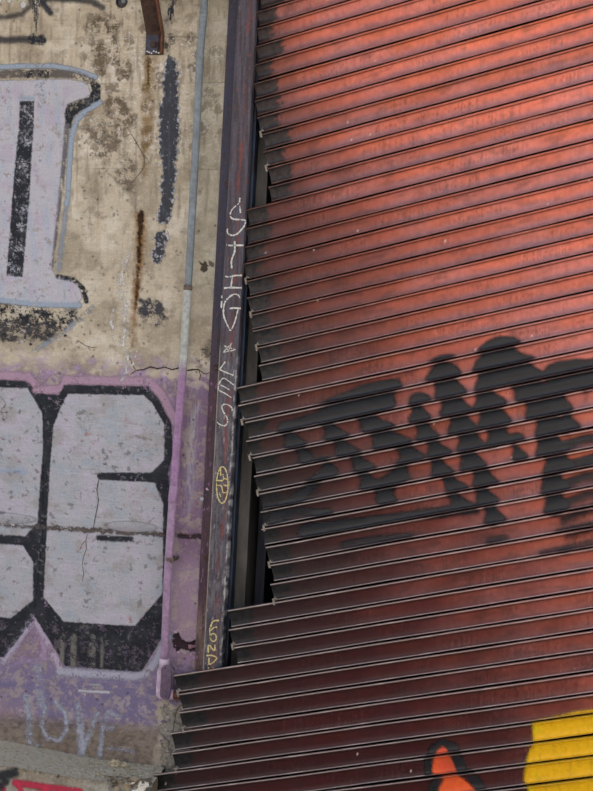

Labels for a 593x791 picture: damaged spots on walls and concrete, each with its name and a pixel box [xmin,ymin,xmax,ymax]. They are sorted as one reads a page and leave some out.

rust [132,210,145,326]
crack [129,358,210,380]